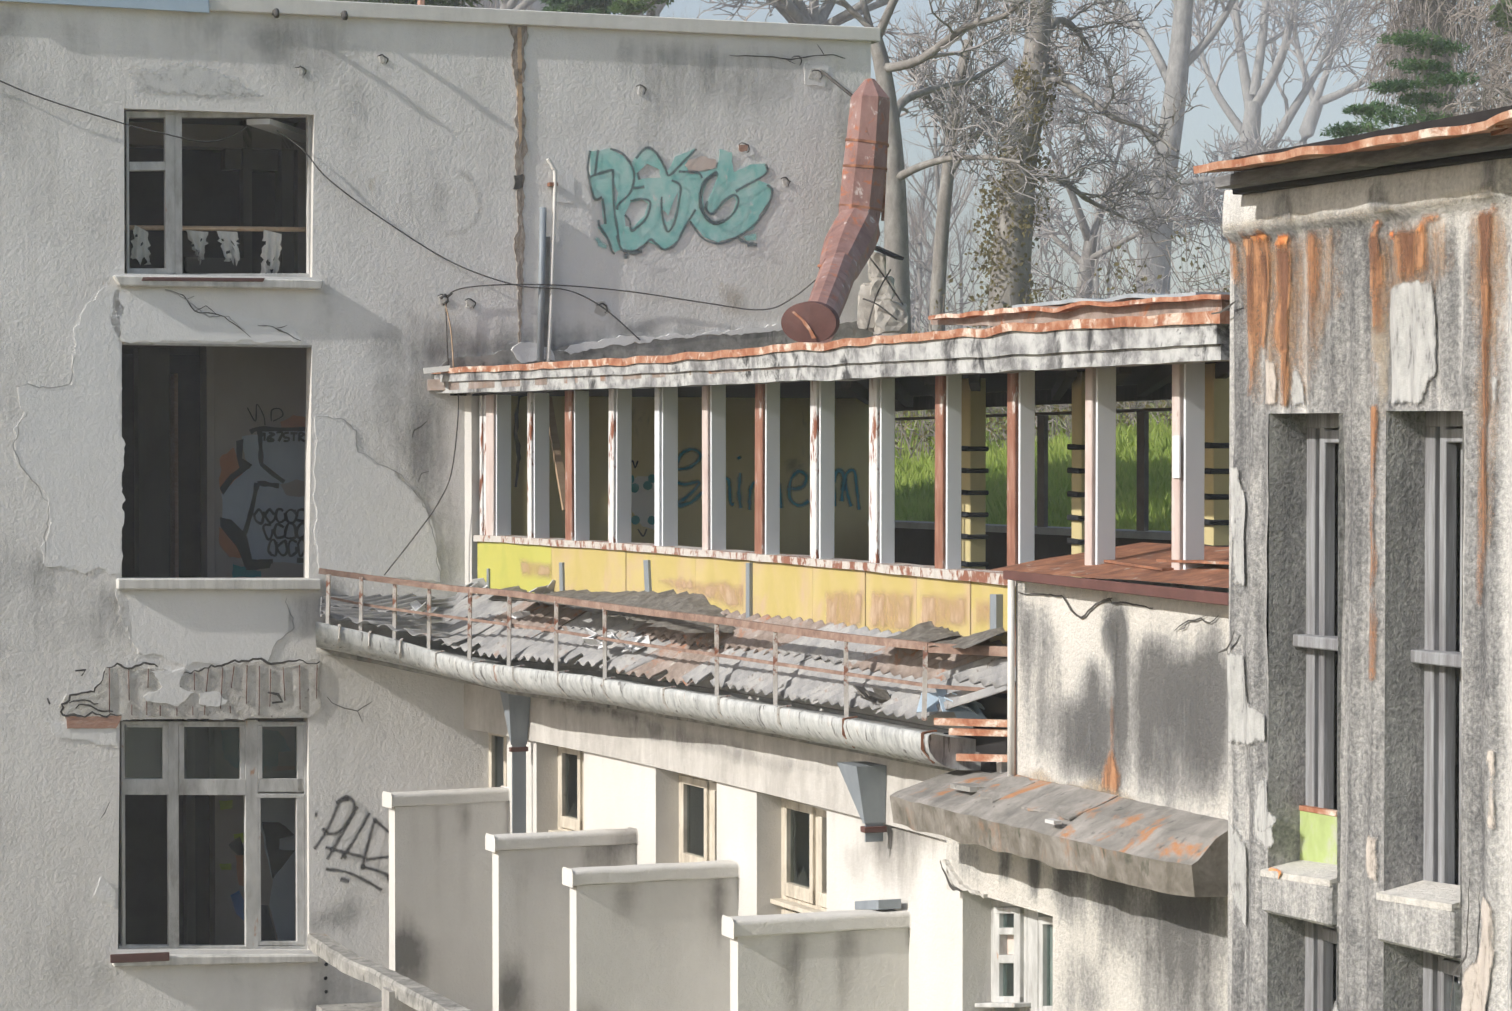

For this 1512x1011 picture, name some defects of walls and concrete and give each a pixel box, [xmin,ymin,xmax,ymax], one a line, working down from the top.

rust [1193,110,1512,174]
crack [165,289,301,341]
rust [1228,230,1331,406]
rust [1369,215,1444,330]
flaking render [1390,280,1436,404]
rust [1474,205,1504,571]
flaking render [12,285,322,749]
crack [1018,592,1235,653]
flaking render [1450,879,1510,1011]